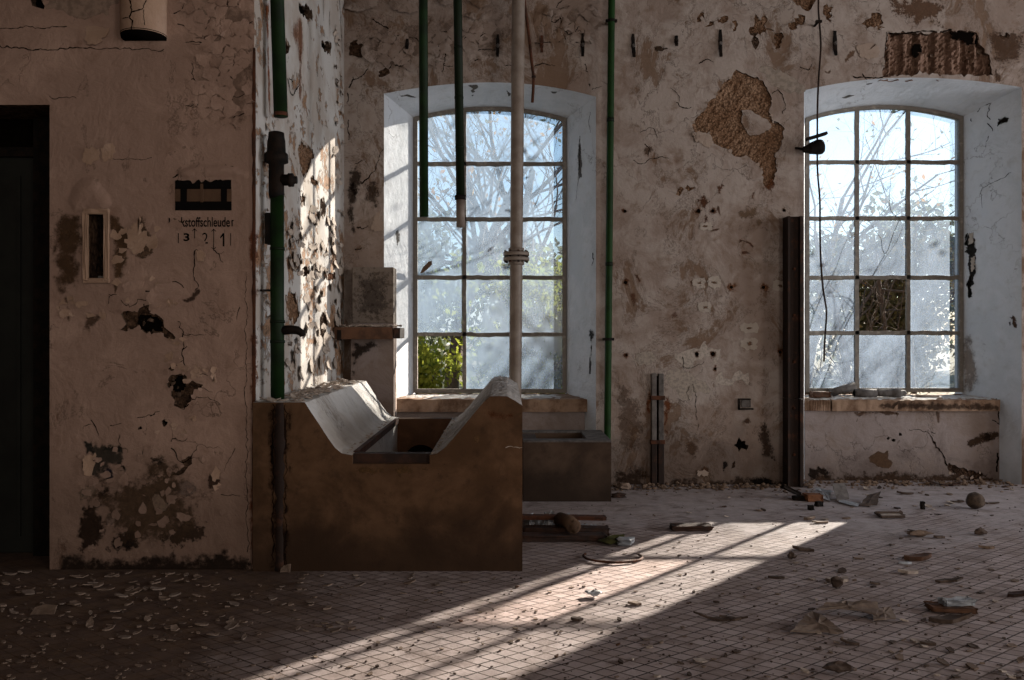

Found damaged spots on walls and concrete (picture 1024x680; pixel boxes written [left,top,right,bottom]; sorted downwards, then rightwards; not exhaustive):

crack [0,0,253,80]
spalling [862,13,991,85]
spalling [692,70,785,187]
peeling [259,138,402,402]
spalling [56,296,175,339]
spalling [162,367,217,408]
crack [910,429,948,466]
peeling [73,439,227,547]
damp [61,441,251,570]